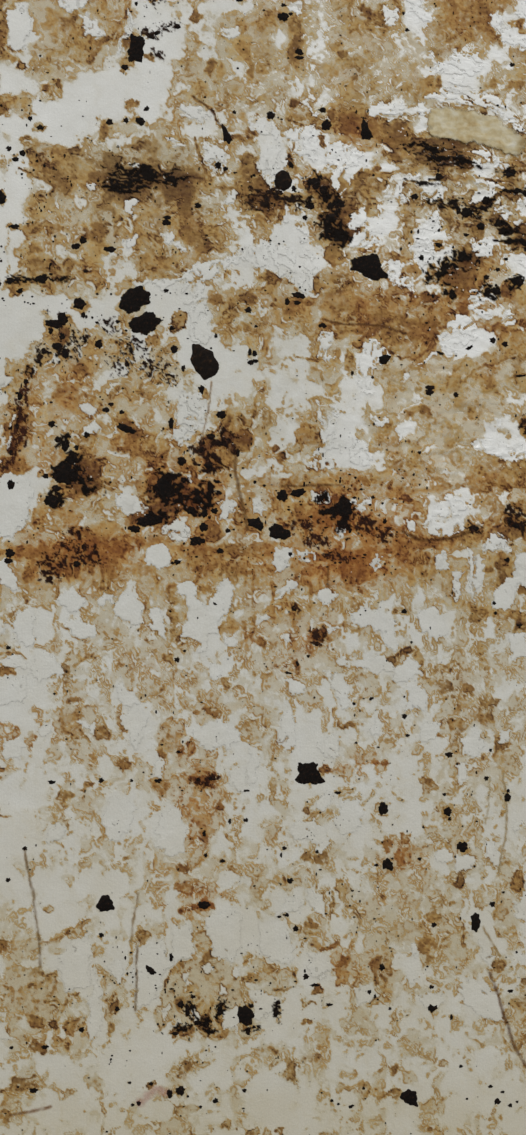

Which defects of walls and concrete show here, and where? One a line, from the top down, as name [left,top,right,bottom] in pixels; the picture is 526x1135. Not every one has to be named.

rust [0,0,526,836]
water stain [249,920,312,1020]
water stain [0,1046,284,1135]
water stain [309,1013,521,1135]